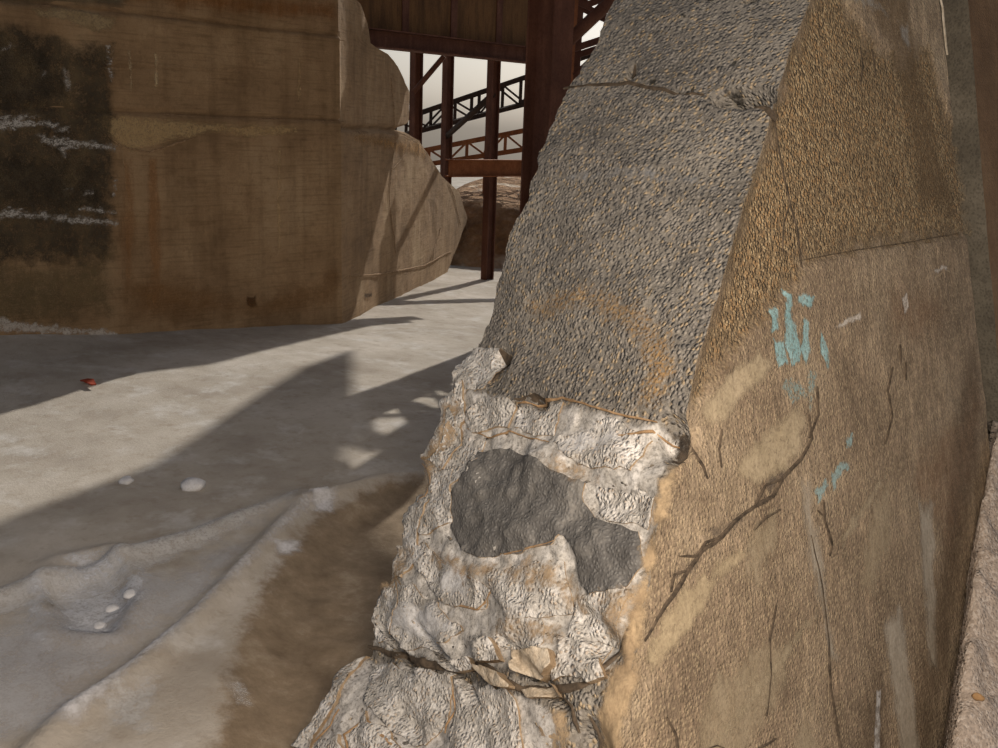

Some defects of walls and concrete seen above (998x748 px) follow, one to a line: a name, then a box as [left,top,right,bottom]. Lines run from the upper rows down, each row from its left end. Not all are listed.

leakage [0,24,117,335]
crack [563,64,705,96]
crack [730,93,957,267]
crack [367,645,446,670]
spalling [290,347,692,748]
crack [470,386,820,748]
crack [810,500,842,748]